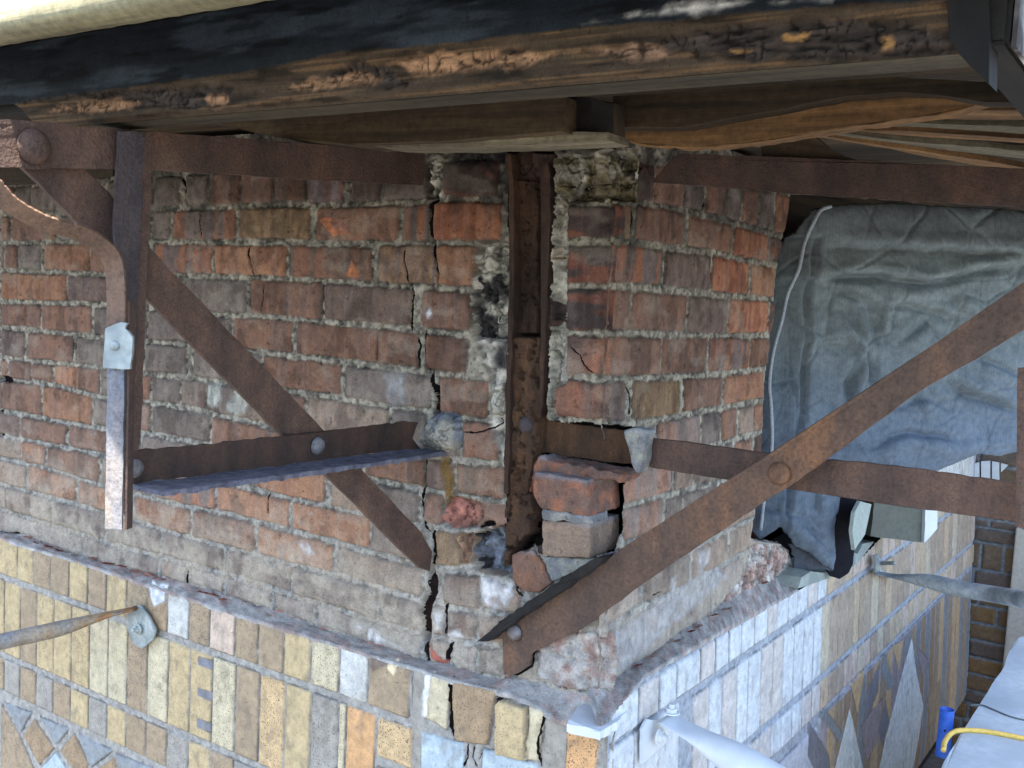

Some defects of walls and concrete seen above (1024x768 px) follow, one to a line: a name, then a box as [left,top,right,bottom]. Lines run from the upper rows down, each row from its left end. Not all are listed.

crack [404,199,441,411]
spalling [442,496,620,592]
spalling [673,538,792,642]
spalling [538,630,619,691]
crack [536,706,550,766]